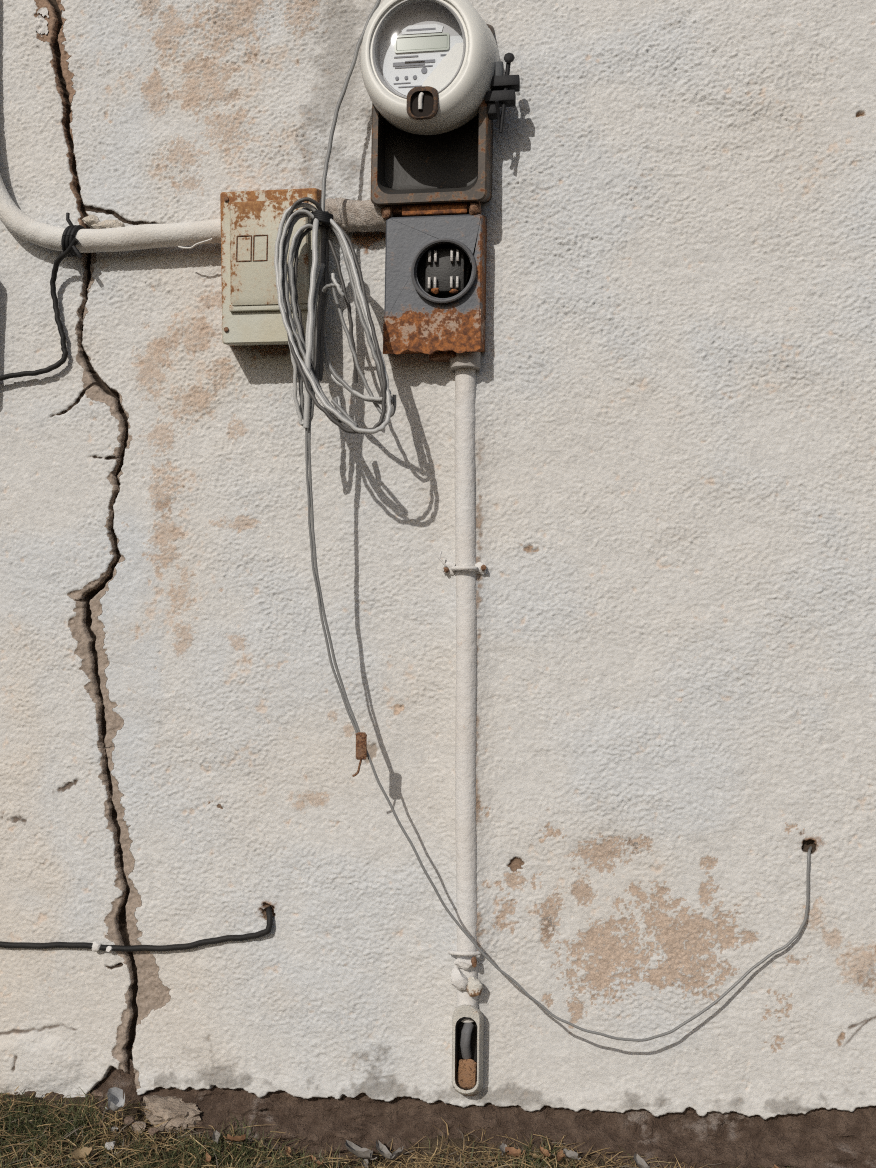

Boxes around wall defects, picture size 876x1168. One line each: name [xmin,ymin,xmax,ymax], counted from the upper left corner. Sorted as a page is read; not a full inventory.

rust [383,309,486,354]
crack [33,0,171,1091]
peeling [482,834,758,1033]
peeling [763,989,792,1021]
crack [0,1025,75,1071]
spalling [124,1116,160,1136]